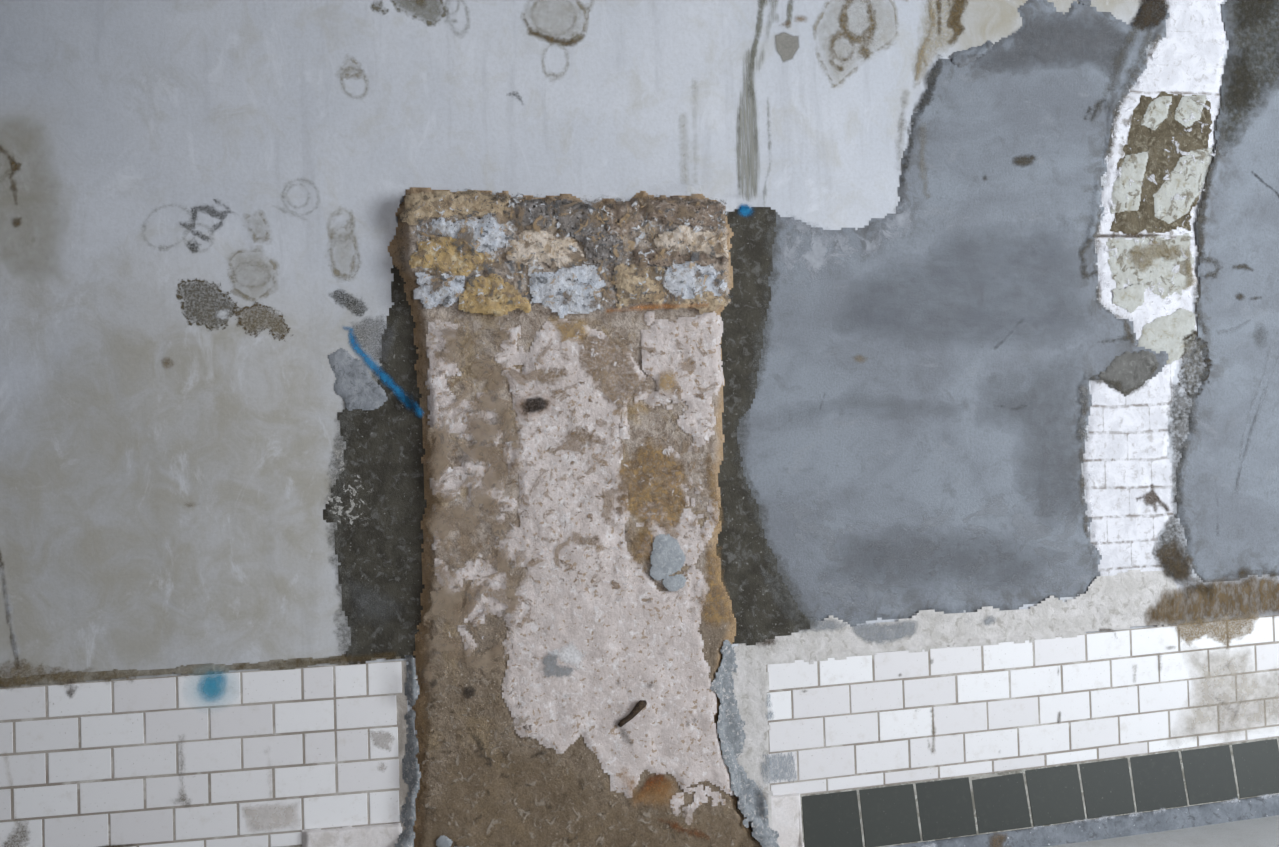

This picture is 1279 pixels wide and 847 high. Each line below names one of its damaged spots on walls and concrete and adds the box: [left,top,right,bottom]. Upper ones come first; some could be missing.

water stain [996,0,1169,90]
water stain [1222,0,1279,141]
water stain [0,147,21,201]
water stain [1014,156,1034,166]
spalling [333,290,390,359]
water stain [716,0,876,646]
peeling [732,0,1228,829]
peeling [326,475,364,525]
peeling [425,320,537,654]
peeling [619,384,720,566]
spalling [372,733,391,749]
peeling [670,785,726,825]